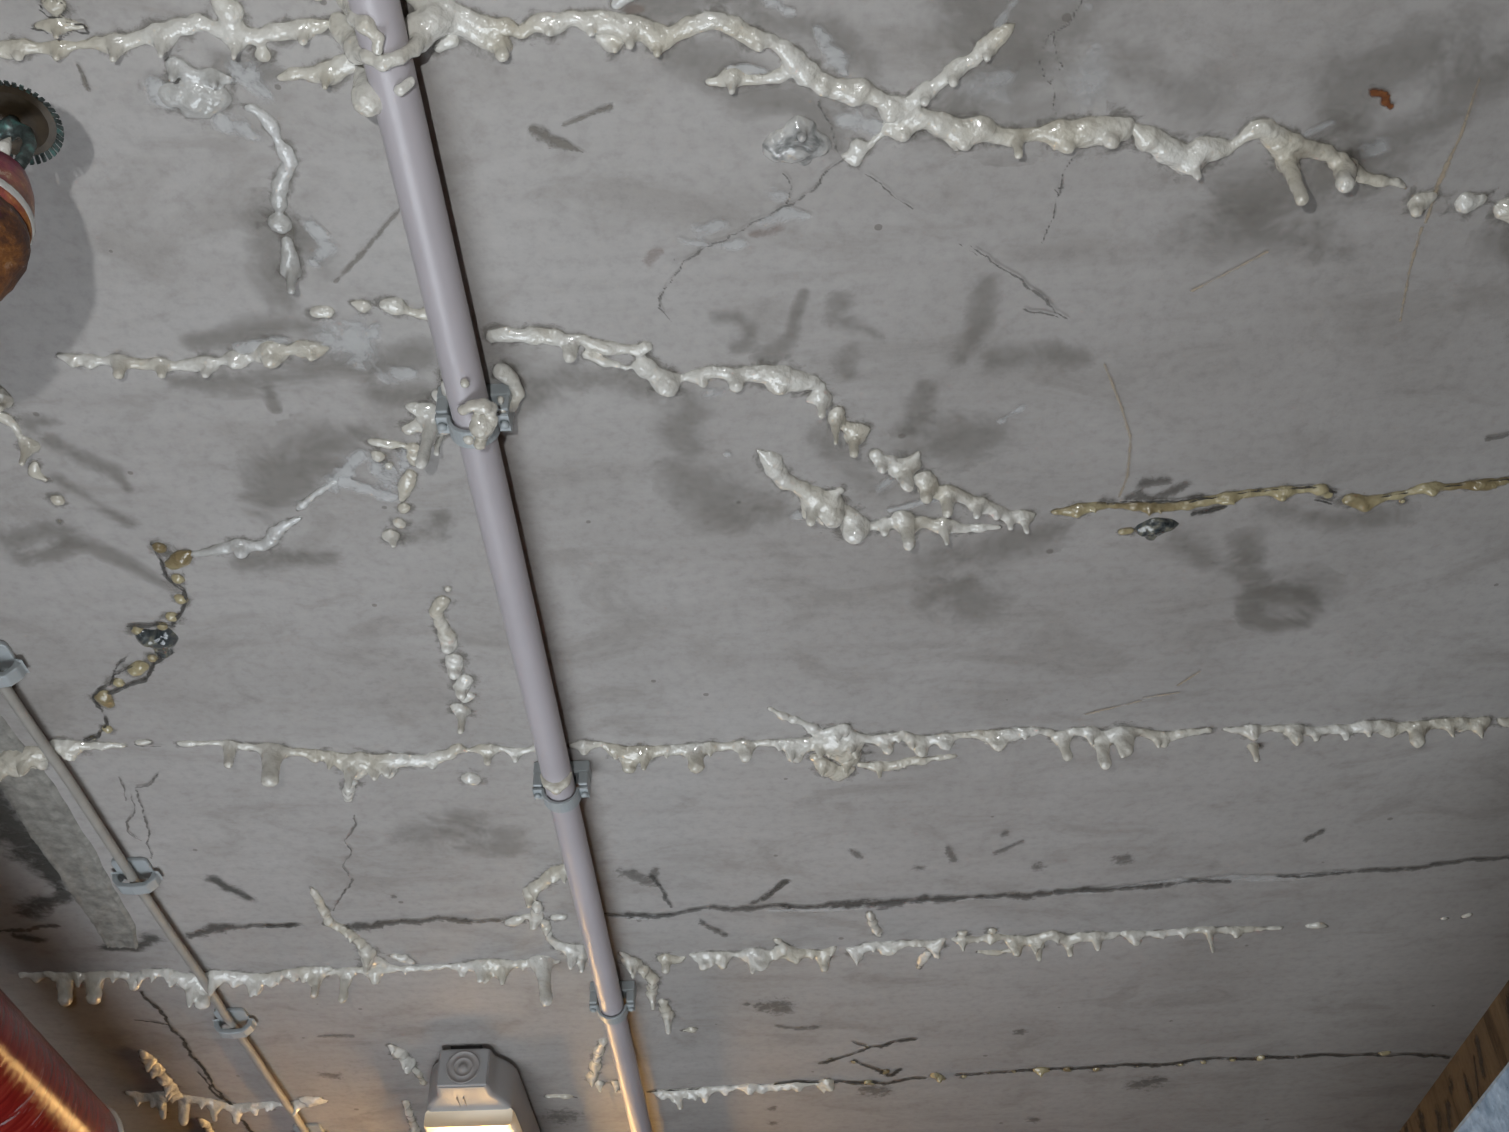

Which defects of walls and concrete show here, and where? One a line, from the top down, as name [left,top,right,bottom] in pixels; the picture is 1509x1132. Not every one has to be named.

water stain [0,0,1509,321]
rust [1369,89,1394,110]
water stain [128,363,525,635]
water stain [486,324,1509,551]
crack [83,543,187,856]
water stain [567,707,1509,781]
crack [186,924,299,939]
water stain [18,864,588,1010]
crack [333,818,500,931]
crack [605,876,1231,937]
water stain [619,911,1283,1035]
crack [135,991,254,1132]